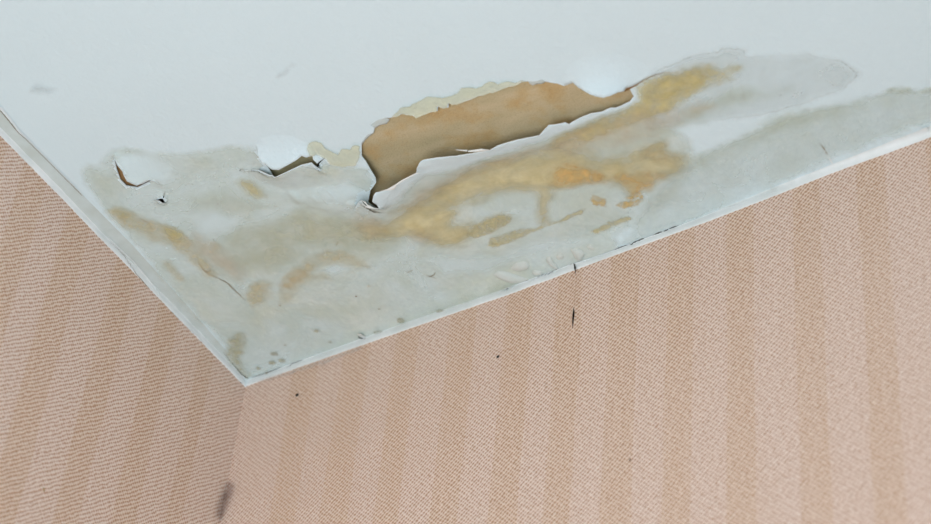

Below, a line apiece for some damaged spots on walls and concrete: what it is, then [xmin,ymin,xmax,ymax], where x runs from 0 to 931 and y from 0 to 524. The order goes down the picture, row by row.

peeling [114,152,166,188]
peeling [239,135,328,190]
water stain [171,71,717,349]
peeling [353,54,669,224]